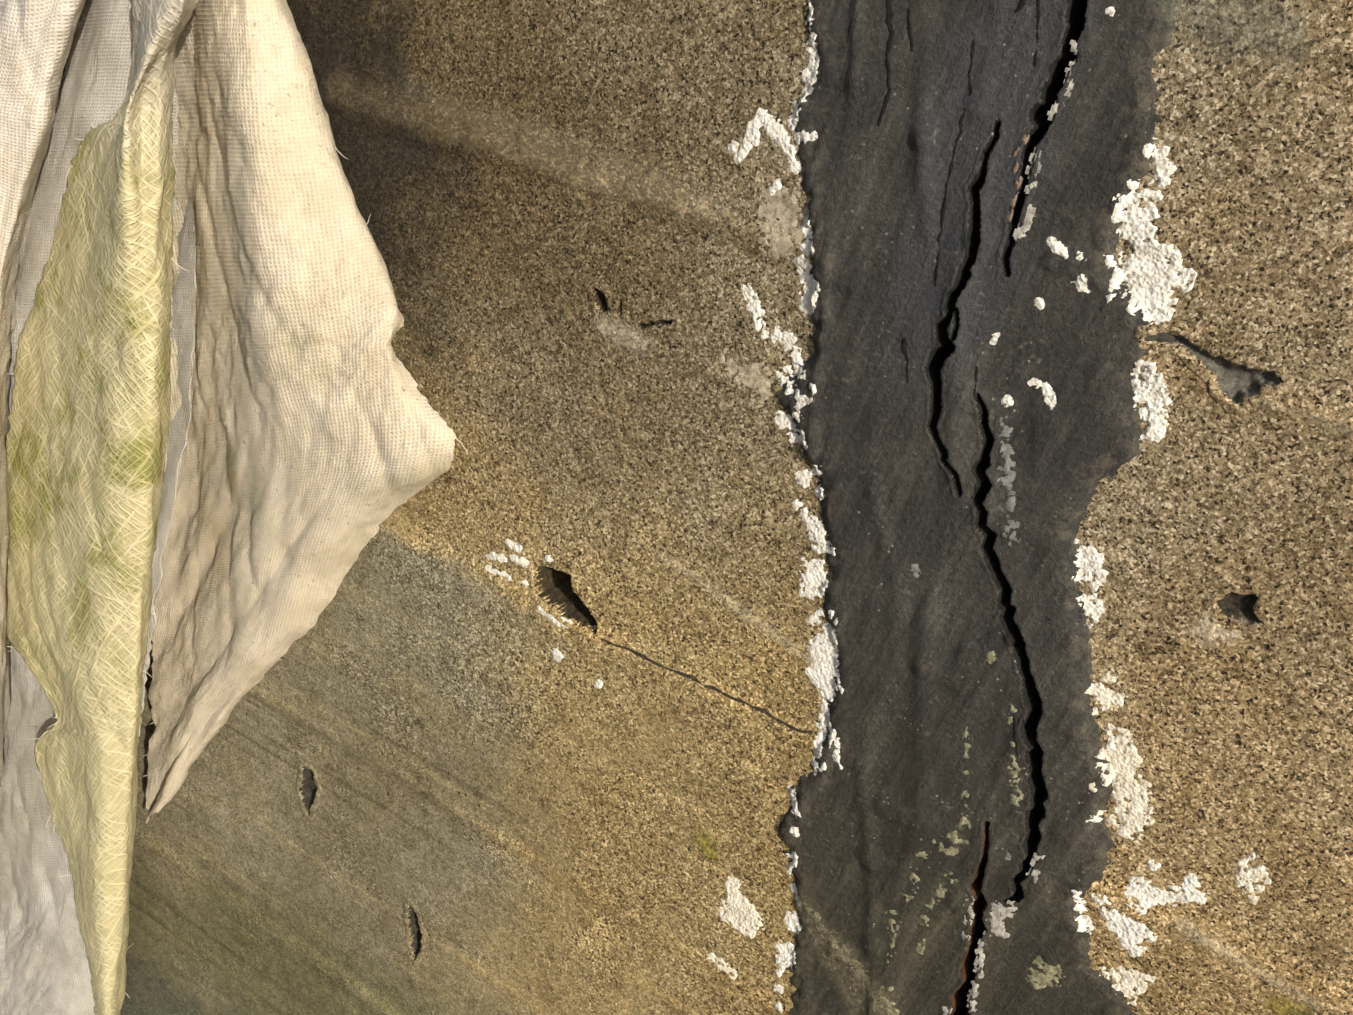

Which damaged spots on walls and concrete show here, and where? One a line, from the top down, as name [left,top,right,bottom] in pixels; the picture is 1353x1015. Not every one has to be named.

crack [877,0,914,127]
water stain [1047,40,1079,121]
water stain [1013,147,1042,242]
peeling [1104,138,1295,443]
crack [902,0,1094,1015]
spalling [485,539,603,643]
spalling [1192,584,1276,641]
crack [600,638,813,734]
spalling [295,760,322,822]
water stain [1026,852,1045,884]
spalling [401,898,427,969]
water stain [942,894,1018,1015]